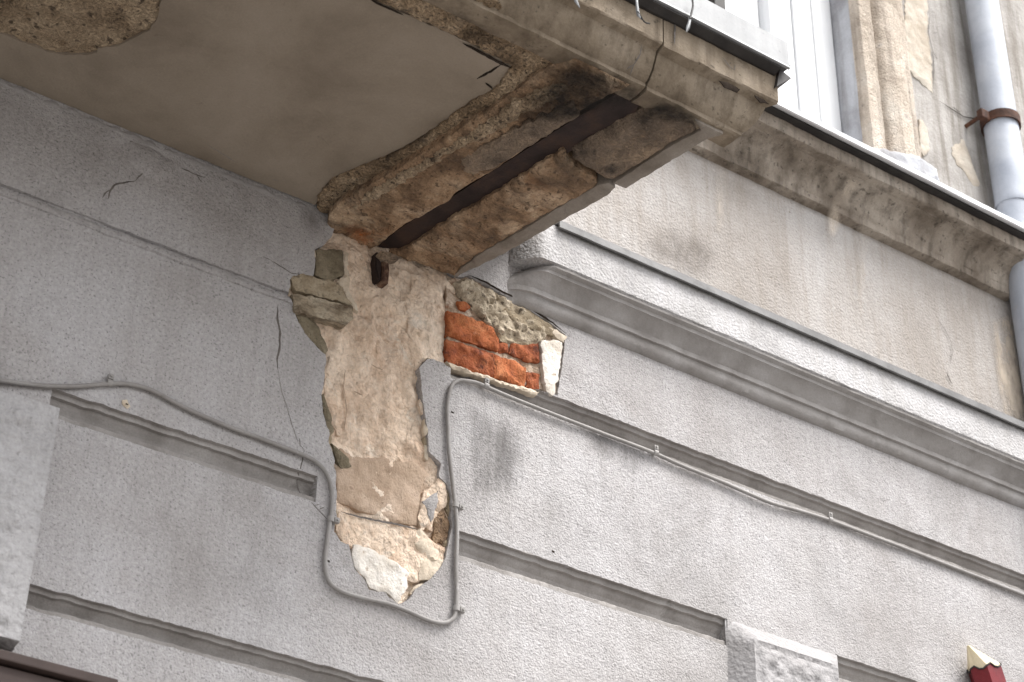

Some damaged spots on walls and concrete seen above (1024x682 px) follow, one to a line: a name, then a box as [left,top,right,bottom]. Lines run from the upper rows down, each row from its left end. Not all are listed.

spalling [0,0,161,53]
peeling [904,0,933,93]
crack [102,173,143,198]
spalling [352,83,579,209]
peeling [951,139,980,187]
crack [276,306,327,519]
spalling [287,233,567,604]